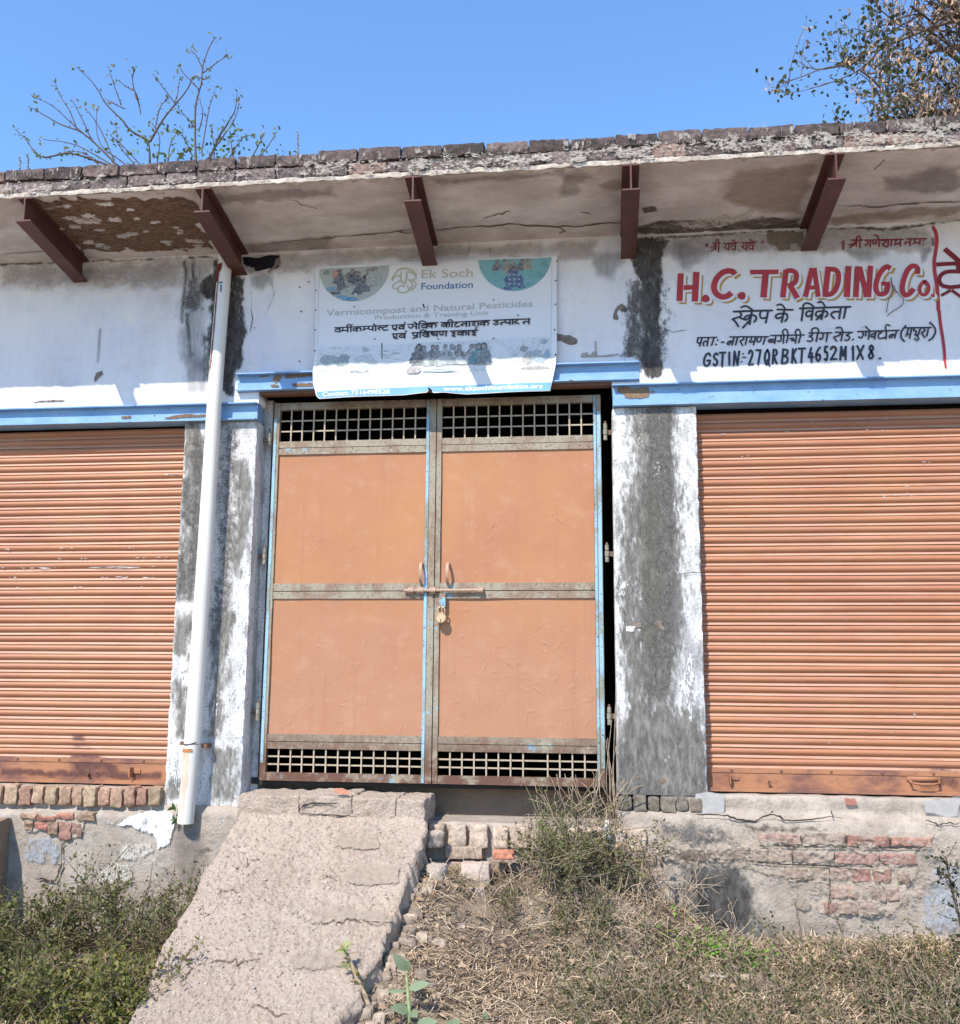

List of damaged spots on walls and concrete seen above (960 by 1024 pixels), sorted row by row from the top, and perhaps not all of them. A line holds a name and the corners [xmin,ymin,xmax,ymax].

flaking render [36,196,213,254]
leakage [180,259,247,396]
crack [263,230,409,245]
crack [435,211,618,257]
leakage [620,166,812,379]
leakage [818,208,959,259]
leakage [173,423,205,661]
leakage [204,422,252,800]
leakage [615,407,707,796]
leakage [171,681,188,737]
flaking render [18,810,175,890]
crack [697,810,918,943]